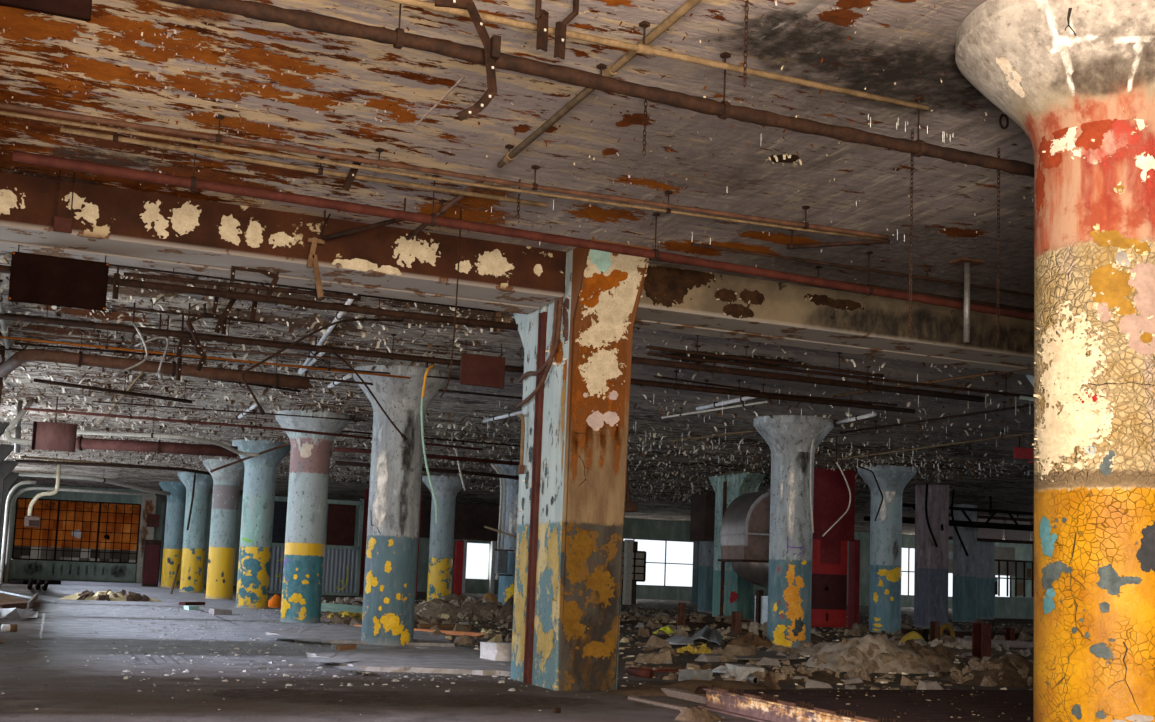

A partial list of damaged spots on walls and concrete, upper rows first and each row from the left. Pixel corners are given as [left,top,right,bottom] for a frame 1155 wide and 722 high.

leakage [1035,0,1155,94]
peeling [0,1,469,212]
peeling [1023,107,1124,219]
peeling [1134,152,1155,182]
peeling [371,93,825,382]
peeling [627,223,1155,503]
peeling [238,559,263,597]
peeling [284,555,319,596]
peeling [1039,516,1073,614]
crack [1051,533,1091,719]
peeling [1069,617,1116,660]
crack [1108,642,1140,711]